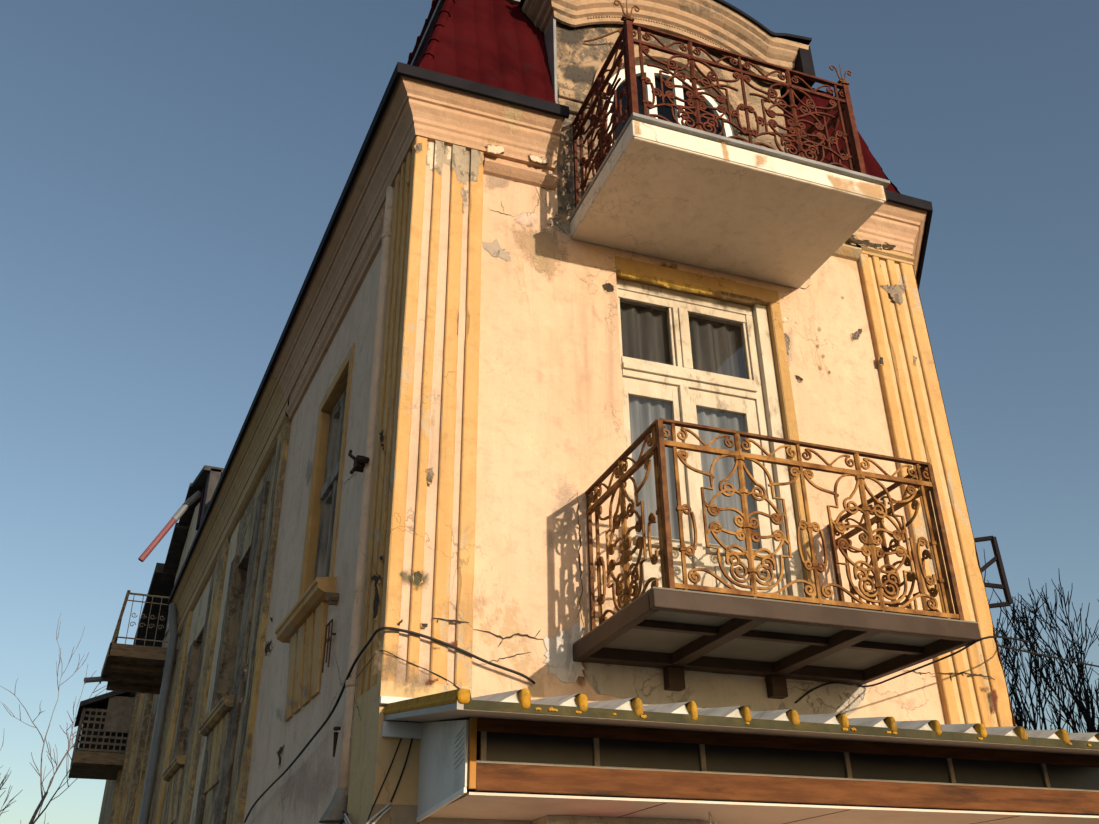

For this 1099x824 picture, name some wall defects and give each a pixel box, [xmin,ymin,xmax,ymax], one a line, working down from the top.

peeling [414,140,506,215]
peeling [482,239,511,262]
flaking render [880,284,905,305]
crack [568,492,585,628]
flaking render [195,442,280,824]
crack [433,618,543,664]